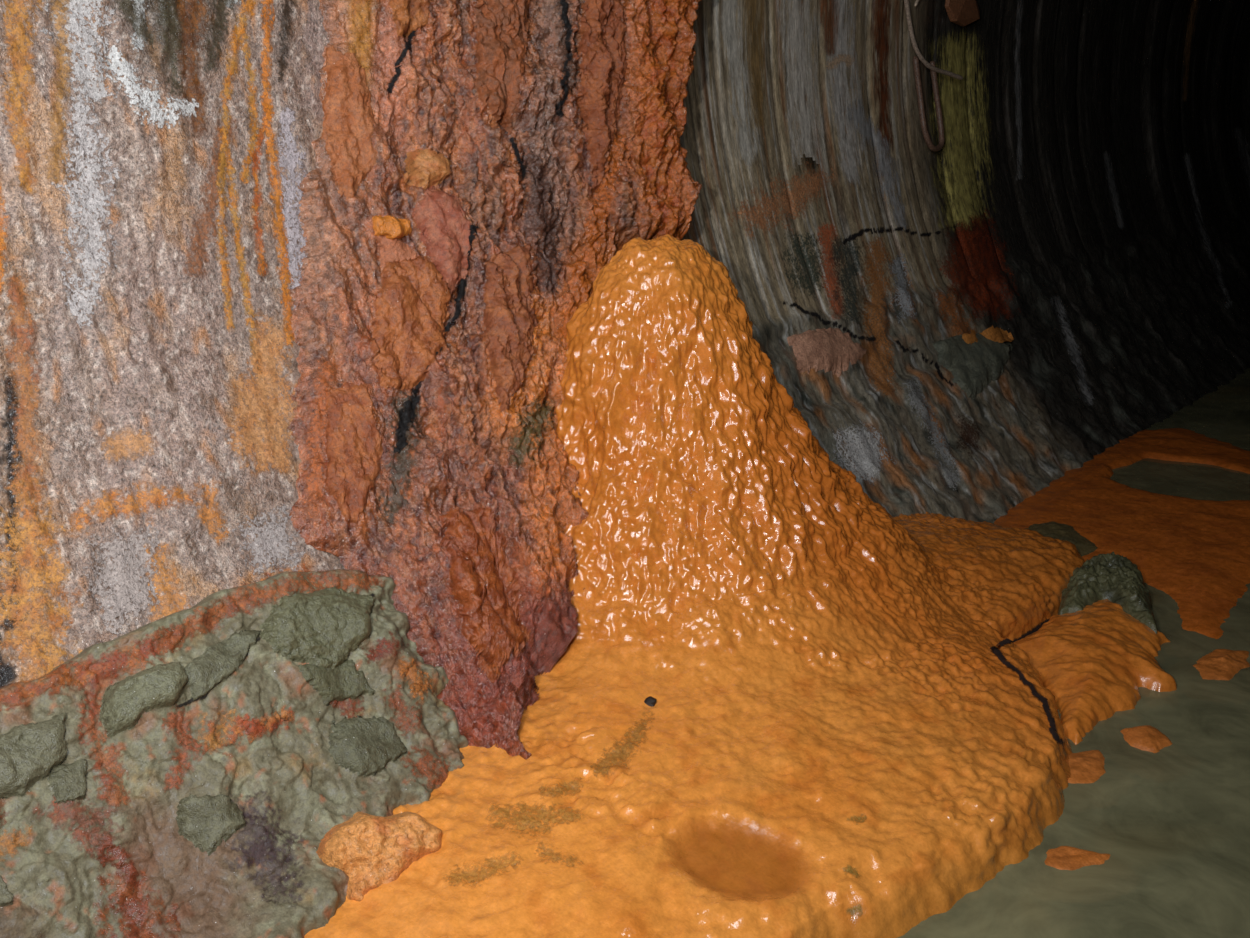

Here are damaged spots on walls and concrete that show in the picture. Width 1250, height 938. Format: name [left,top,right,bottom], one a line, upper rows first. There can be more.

corrosion [2,0,71,192]
leakage [33,0,199,328]
leakage [203,0,241,71]
corrosion [176,0,338,519]
corrosion [861,237,896,396]
leakage [0,376,22,688]
leakage [83,516,161,638]
corrosion [0,183,382,938]
corrosion [362,632,450,788]
crack [990,619,1065,745]
leakage [229,794,304,903]